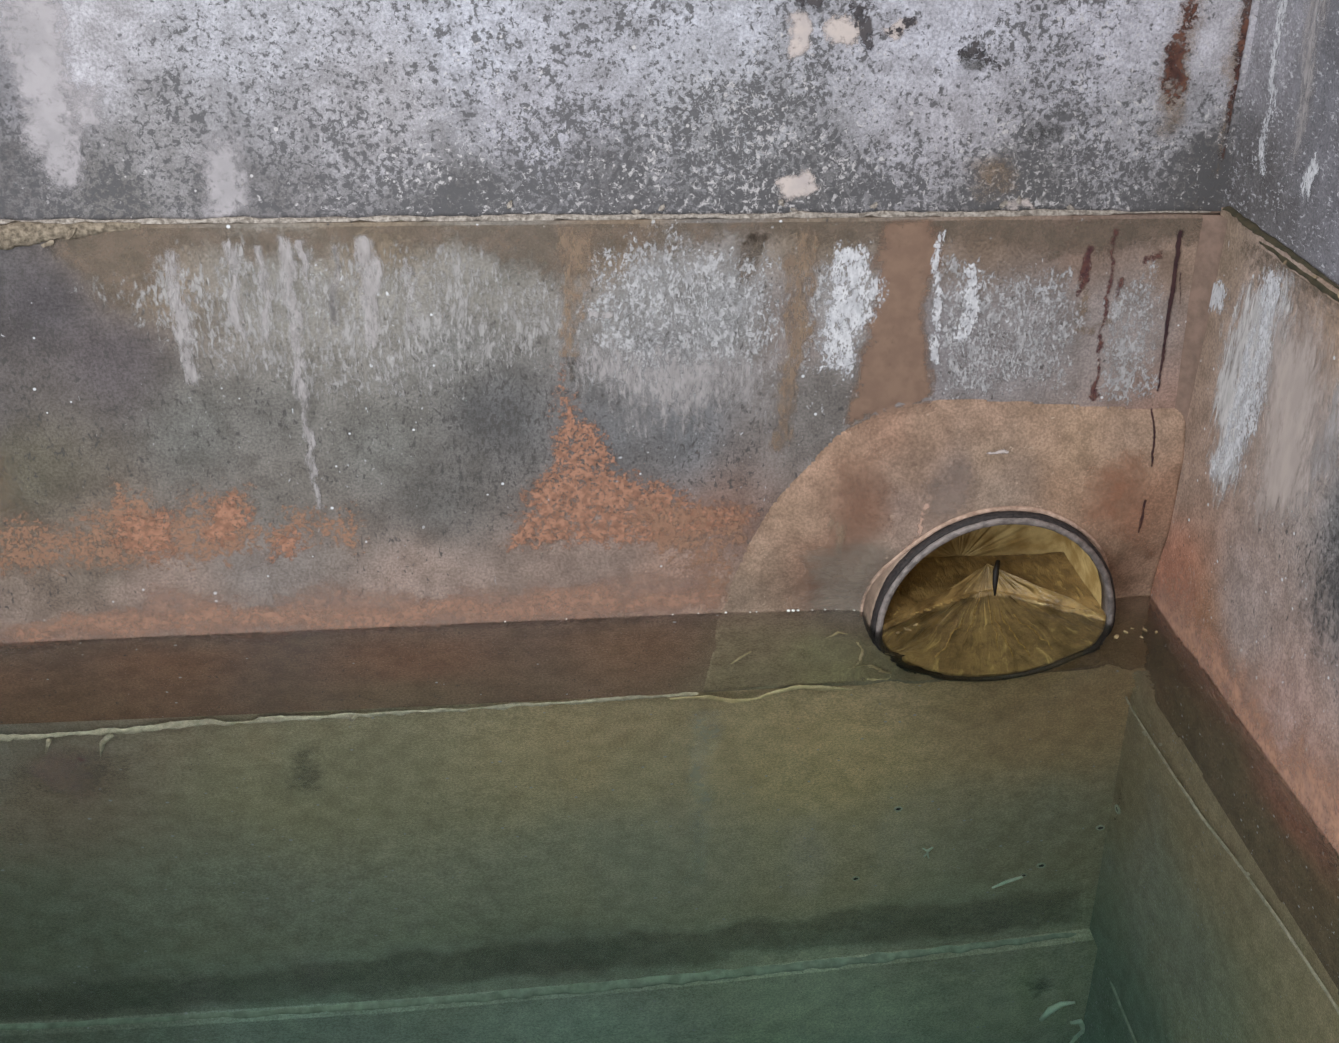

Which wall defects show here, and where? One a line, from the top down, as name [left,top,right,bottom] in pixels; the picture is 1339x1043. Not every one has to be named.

spalling [788,0,917,59]
spalling [957,40,1002,72]
rust [1160,0,1198,105]
rust [1218,0,1252,159]
leakage [52,133,1203,509]
rust [1076,245,1094,297]
rust [1088,229,1124,401]
rust [0,482,366,577]
rust [499,363,760,606]